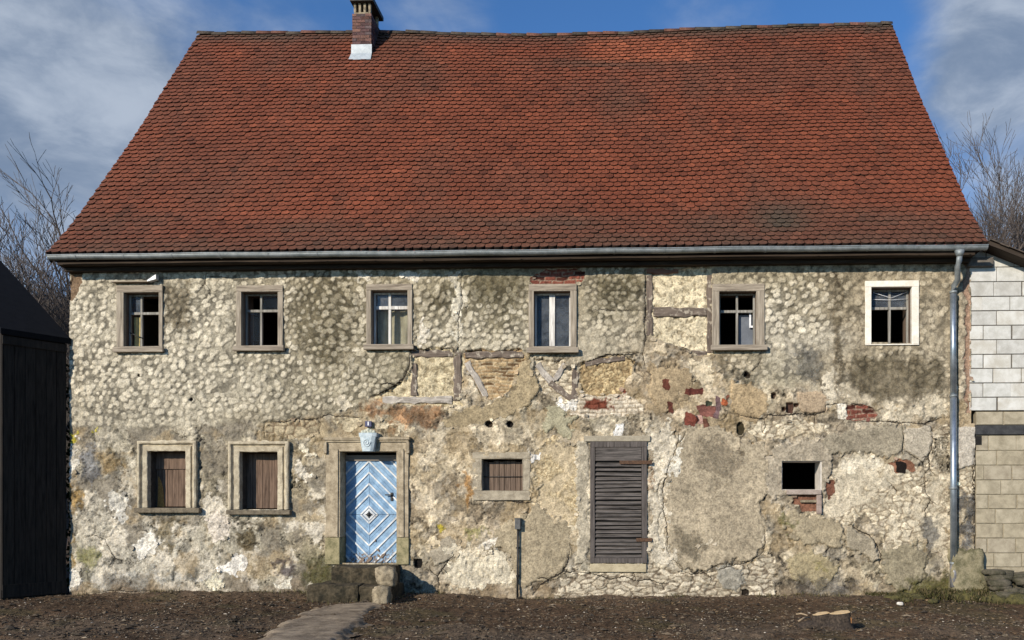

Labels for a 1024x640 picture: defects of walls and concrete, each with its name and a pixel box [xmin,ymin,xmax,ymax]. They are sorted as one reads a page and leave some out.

crack [263,272,476,434]
flaking render [373,268,644,436]
flaking render [554,267,776,599]
water stain [79,443,101,482]
flaking render [737,359,975,565]
water stain [156,517,175,550]
water stain [236,515,267,551]
crack [848,520,882,566]
water stain [271,557,294,576]